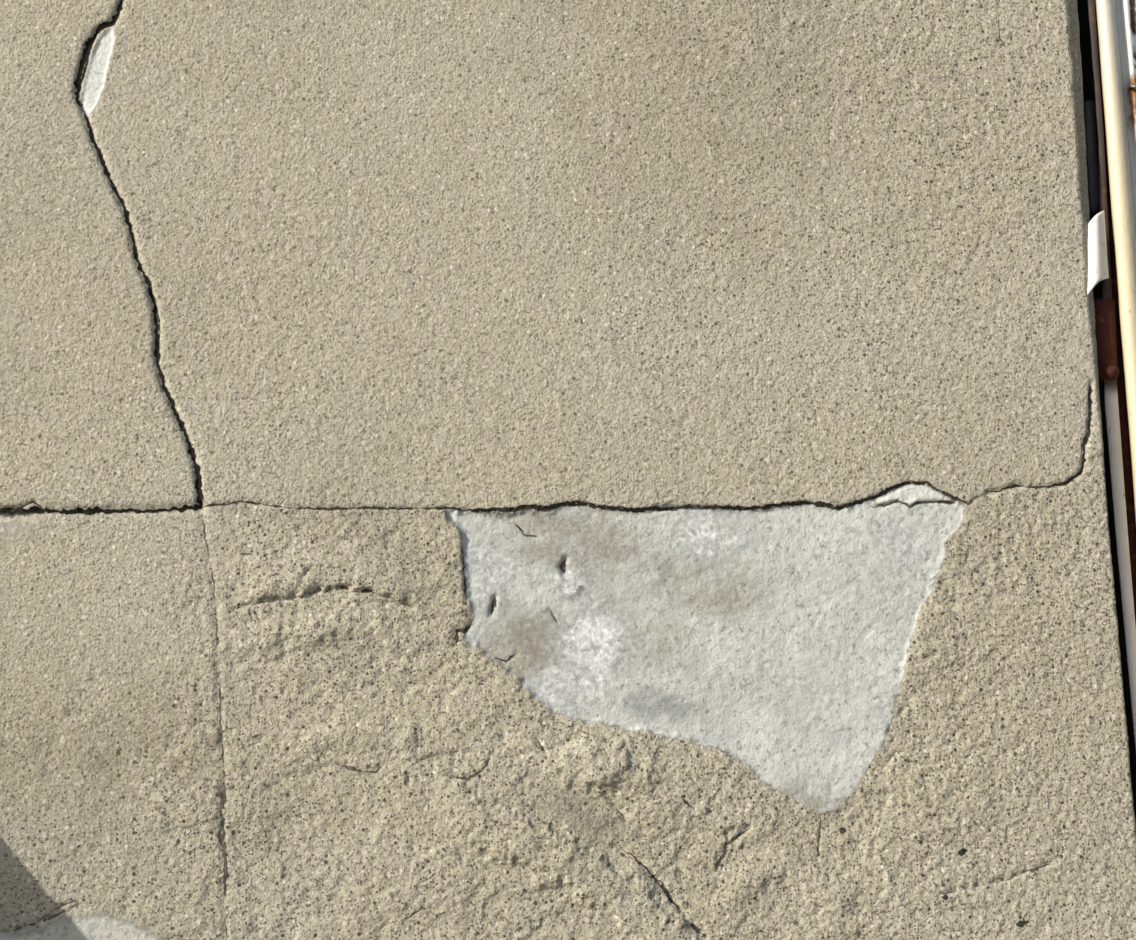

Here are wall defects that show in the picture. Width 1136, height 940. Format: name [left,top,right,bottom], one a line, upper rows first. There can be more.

spalling [81,27,115,116]
corrosion [1127,51,1136,126]
crack [0,0,445,937]
crack [969,382,1092,505]
crack [454,550,471,643]
flaking render [443,480,968,814]
crack [454,758,490,781]
flaking render [0,914,158,940]